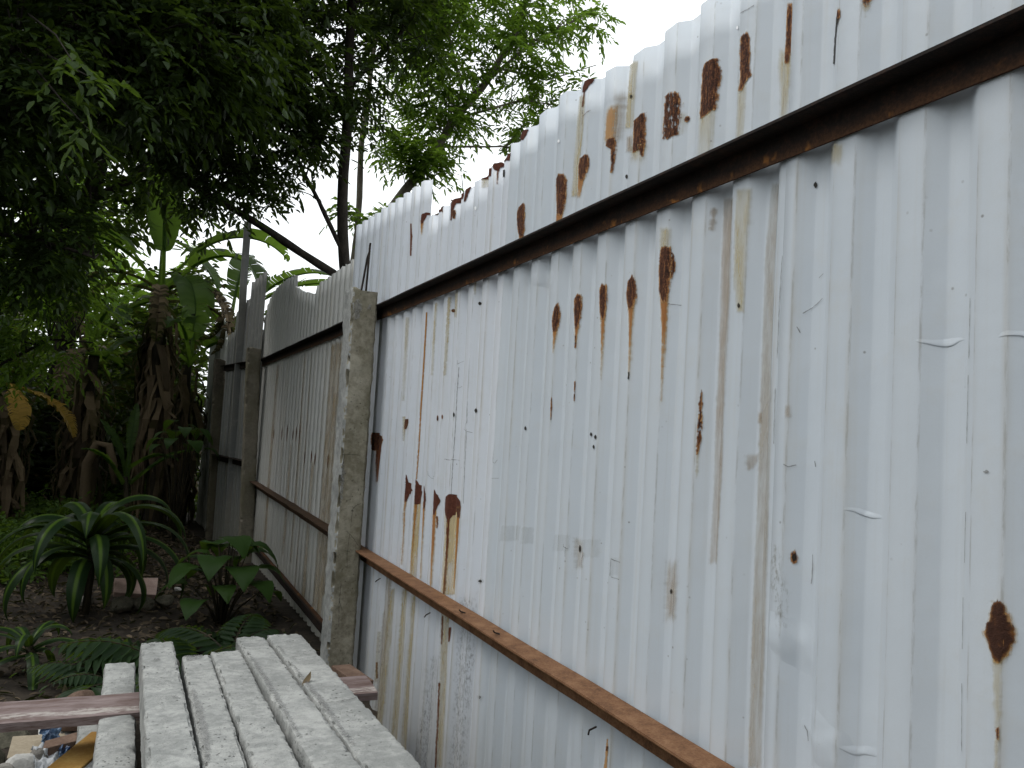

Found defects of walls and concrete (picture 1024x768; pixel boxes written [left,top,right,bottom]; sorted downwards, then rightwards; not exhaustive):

corrosion [738,31,752,91]
corrosion [662,58,722,139]
corrosion [410,187,471,256]
corrosion [482,153,511,184]
corrosion [517,203,525,238]
corrosion [556,154,589,221]
corrosion [632,113,647,157]
corrosion [573,294,583,348]
corrosion [626,275,637,379]
corrosion [658,231,676,379]
corrosion [402,312,461,594]
corrosion [984,600,1016,664]